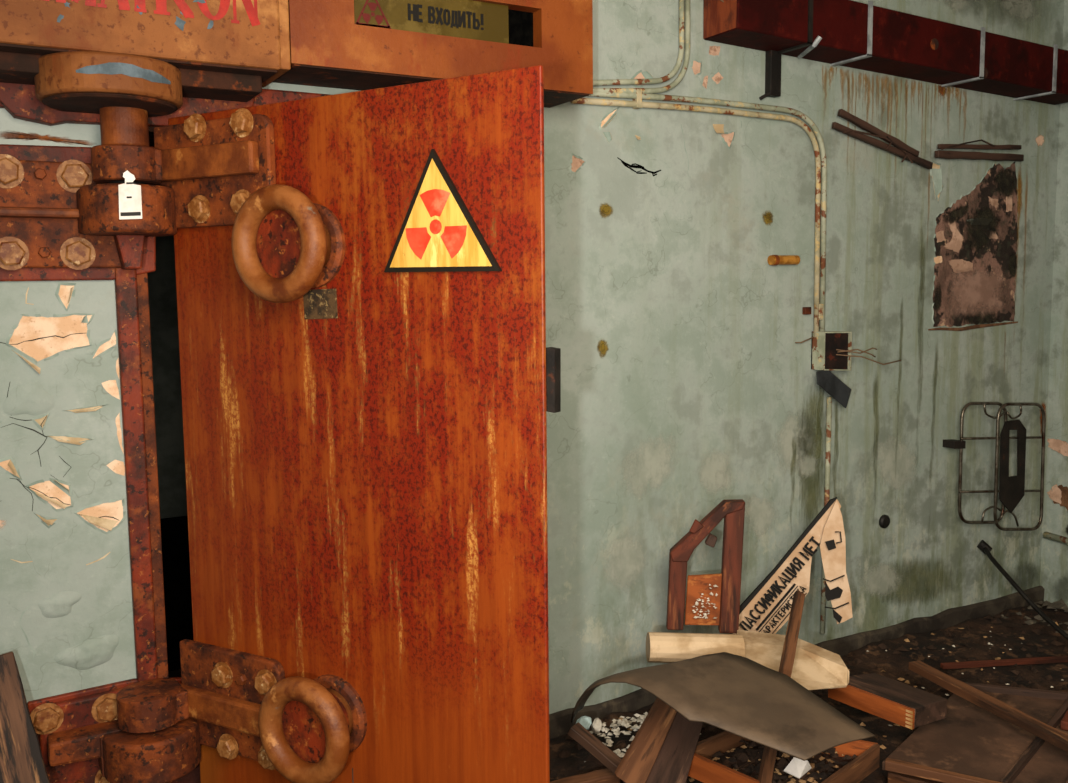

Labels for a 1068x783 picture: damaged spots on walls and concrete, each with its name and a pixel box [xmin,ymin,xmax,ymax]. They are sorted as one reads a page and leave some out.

rust [2,132,89,145]
peeling [5,282,120,413]
crack [3,383,71,511]
peeling [31,412,94,445]
peeling [107,414,125,476]
peeling [1047,438,1068,456]
peeling [0,456,126,534]
flaking render [1047,484,1068,512]